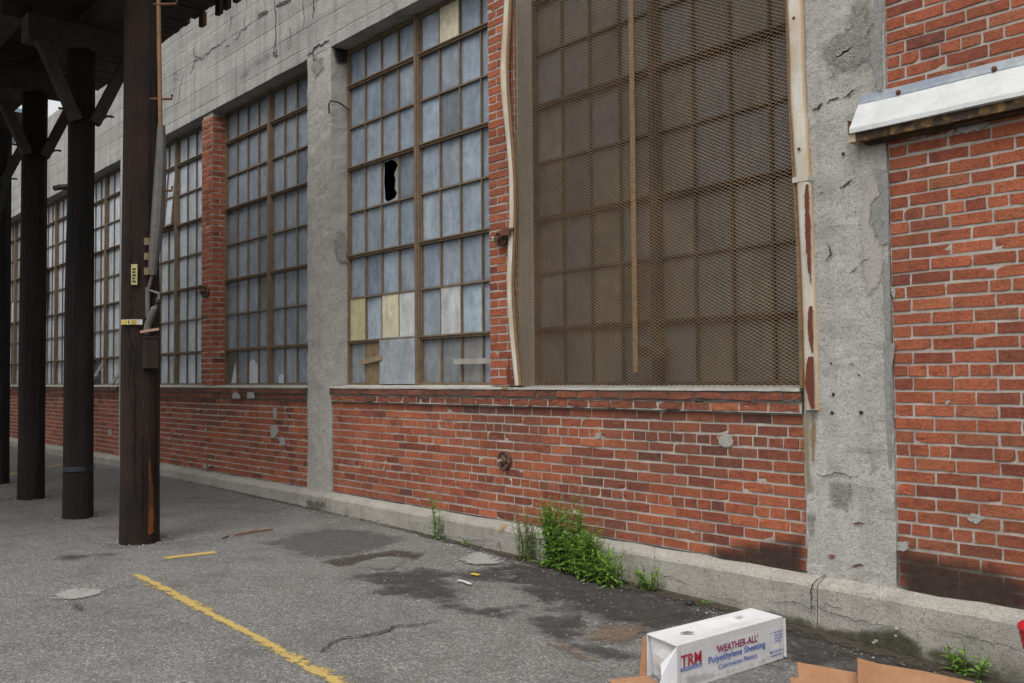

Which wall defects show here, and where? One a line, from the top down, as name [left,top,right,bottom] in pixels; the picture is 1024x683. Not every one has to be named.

crack [172,1,329,98]
spalling [820,1,873,82]
crack [812,89,856,111]
crack [650,569,1023,652]
damp [899,552,1024,610]